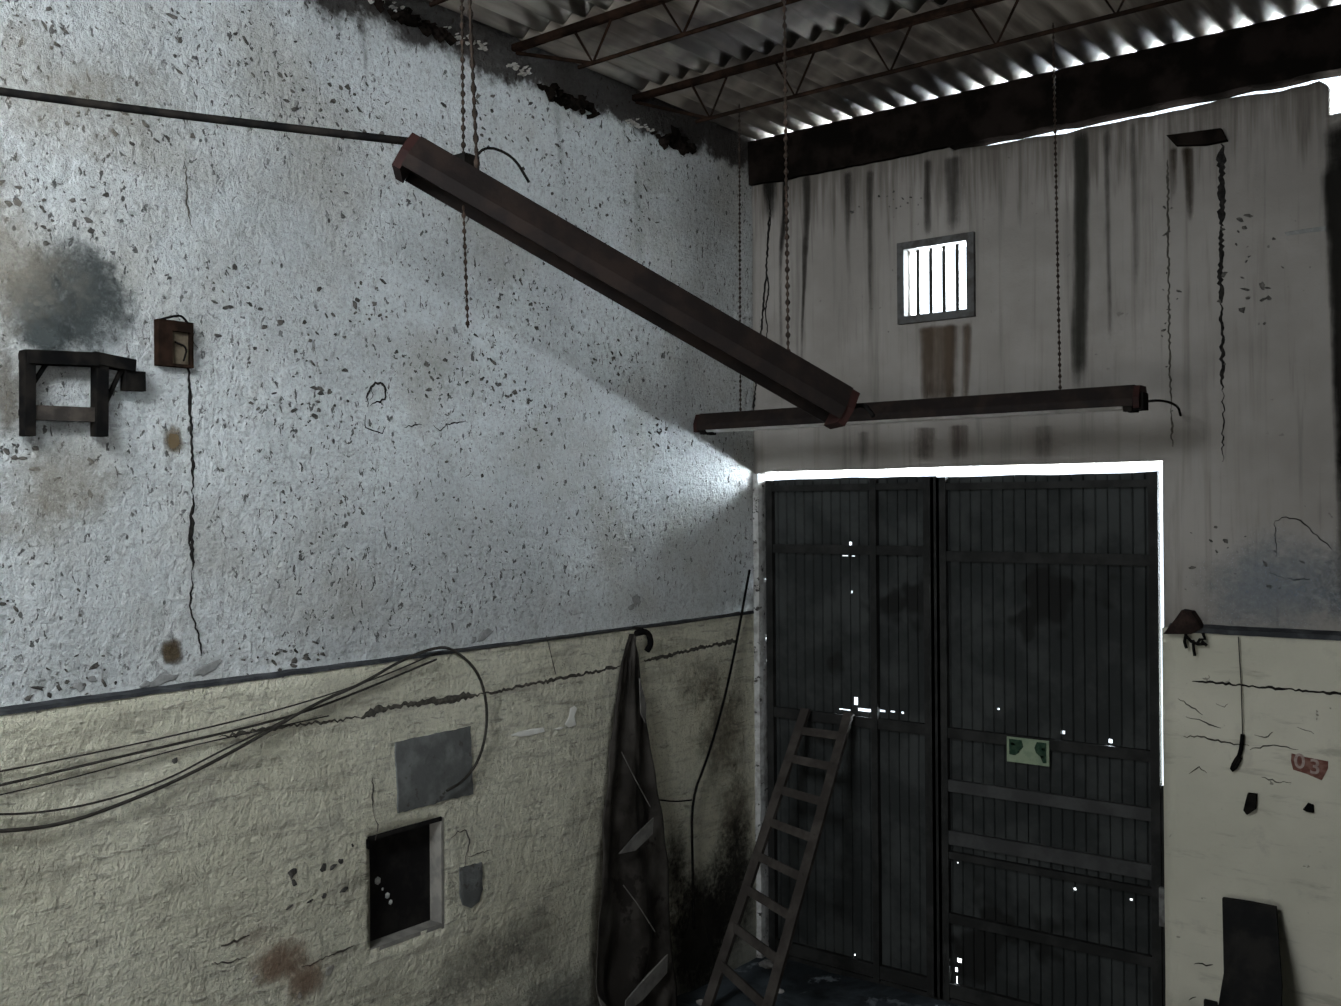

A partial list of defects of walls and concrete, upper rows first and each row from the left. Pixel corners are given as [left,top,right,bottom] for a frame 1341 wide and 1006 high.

leakage [0,240,133,352]
leakage [763,181,786,265]
leakage [802,176,810,327]
leakage [1071,133,1089,373]
crack [1166,160,1174,447]
crack [1216,144,1227,462]
leakage [1324,126,1341,515]
crack [187,331,202,655]
crack [219,639,739,738]
crack [1179,680,1341,783]
rust [262,944,319,996]
leakage [668,786,752,992]